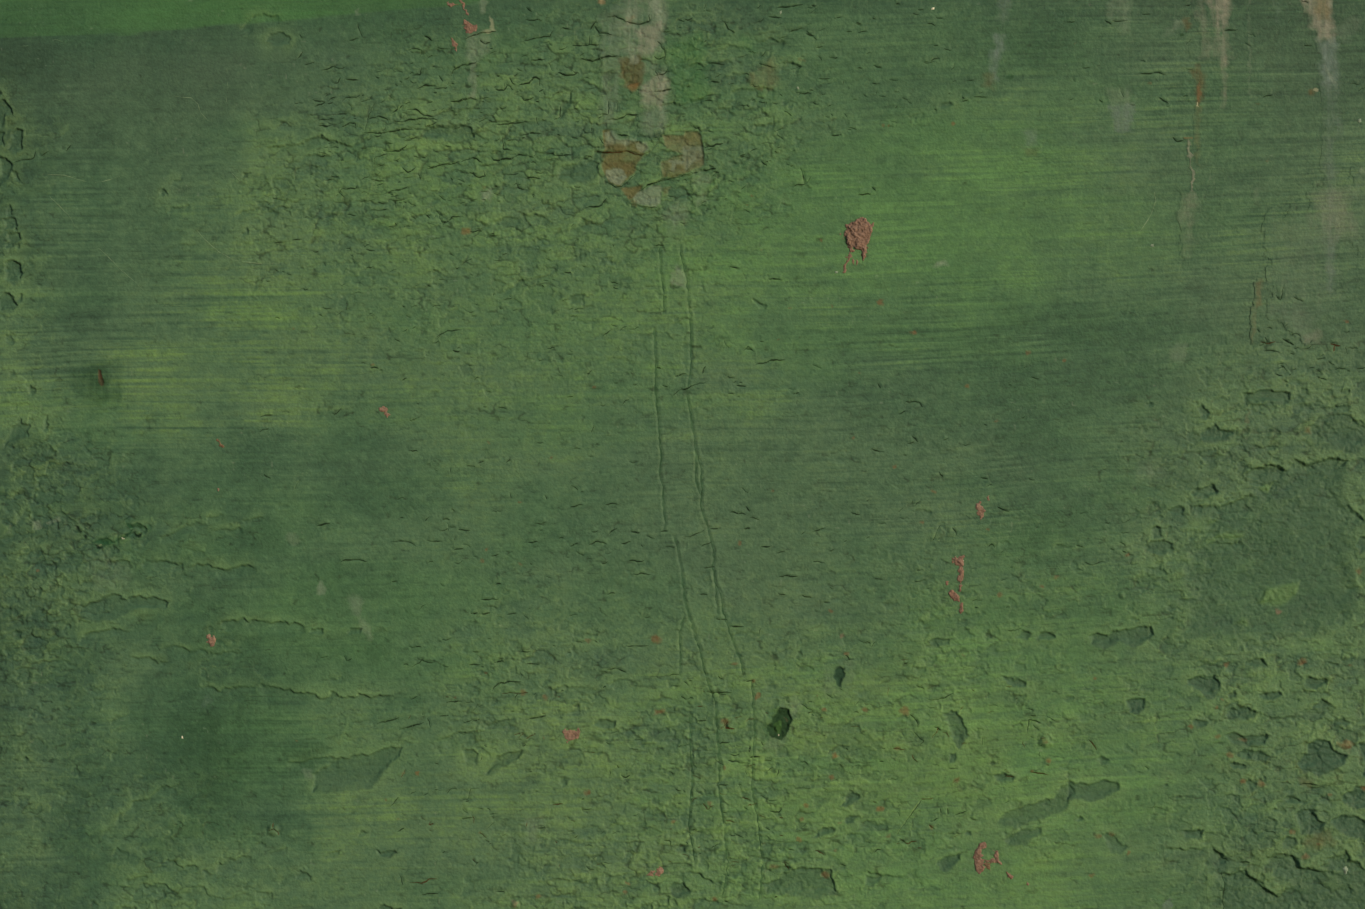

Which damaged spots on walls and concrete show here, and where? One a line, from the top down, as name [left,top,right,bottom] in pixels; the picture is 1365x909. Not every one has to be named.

water stain [1191,0,1254,111]
peeling [0,85,27,318]
peeling [554,125,715,211]
water stain [1252,0,1365,345]
crack [267,3,1055,902]
peeling [1164,383,1365,646]
peeling [287,742,405,798]
peeling [762,704,796,744]
peeling [830,663,851,693]
peeling [938,707,975,768]
peeling [931,751,1123,876]
peeling [1162,670,1365,909]